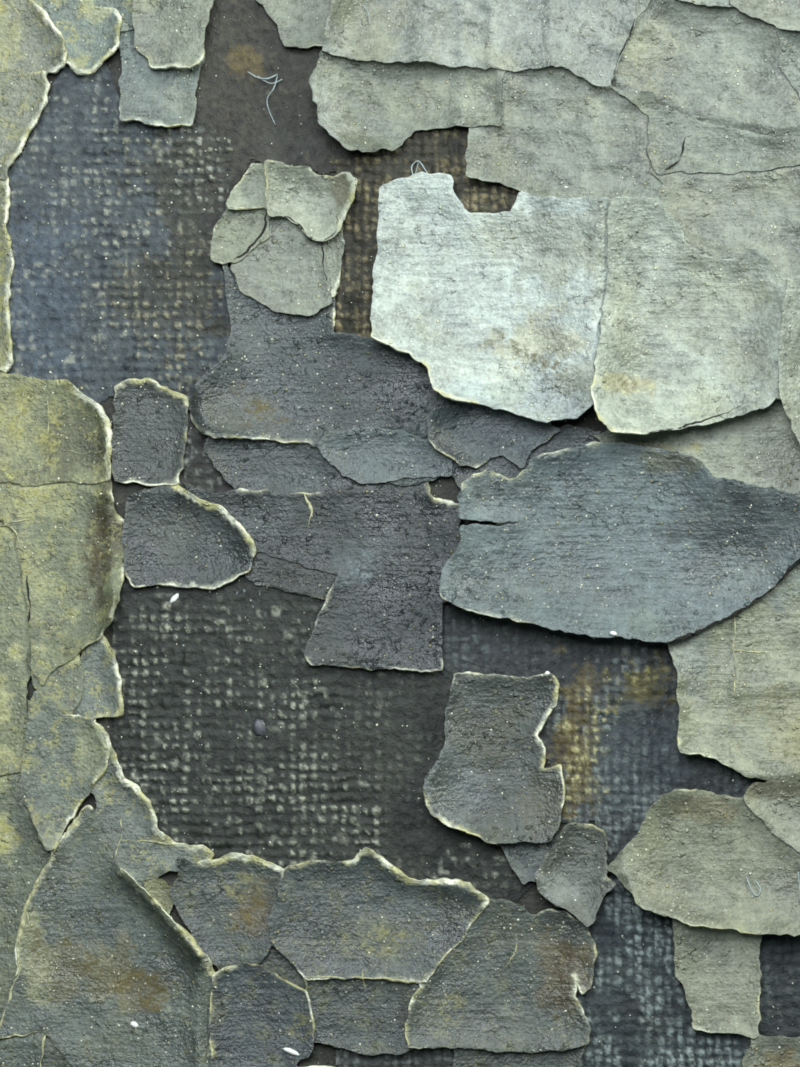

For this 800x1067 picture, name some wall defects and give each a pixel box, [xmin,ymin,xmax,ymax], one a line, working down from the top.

crack [611,19,635,82]
crack [665,139,685,170]
crack [24,578,32,622]
peeling [0,0,604,1067]
peeling [112,441,800,1067]
crack [0,807,86,1067]